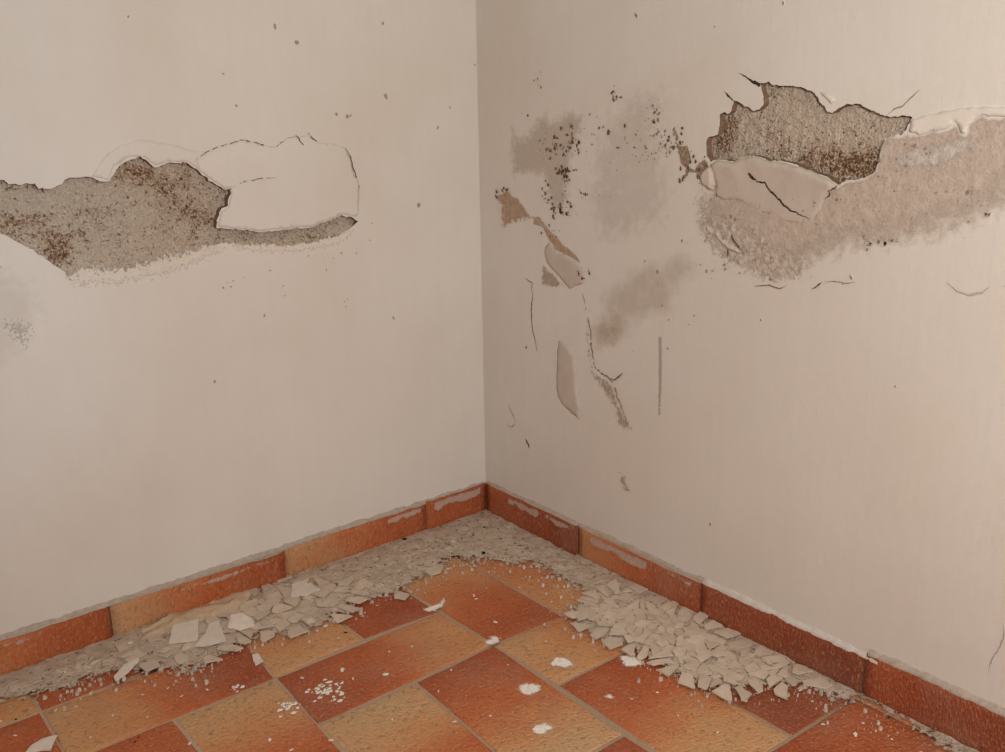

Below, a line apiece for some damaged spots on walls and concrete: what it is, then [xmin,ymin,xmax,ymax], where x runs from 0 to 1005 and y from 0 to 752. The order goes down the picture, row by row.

flaking render [0,139,354,288]
flaking render [495,125,628,423]
flaking render [195,620,226,647]
flaking render [394,591,410,600]